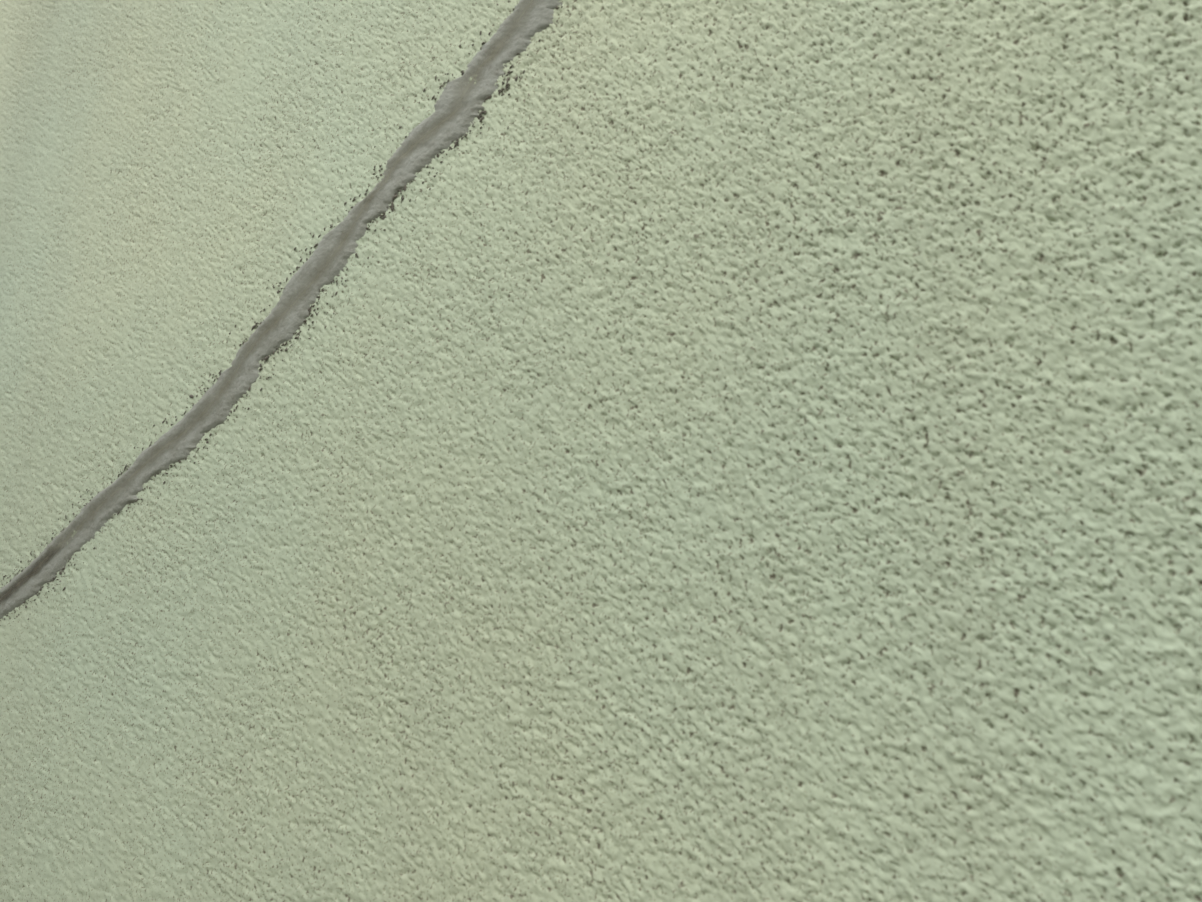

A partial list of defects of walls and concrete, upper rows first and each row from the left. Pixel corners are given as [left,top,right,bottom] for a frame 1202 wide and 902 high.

crack [0,0,569,626]